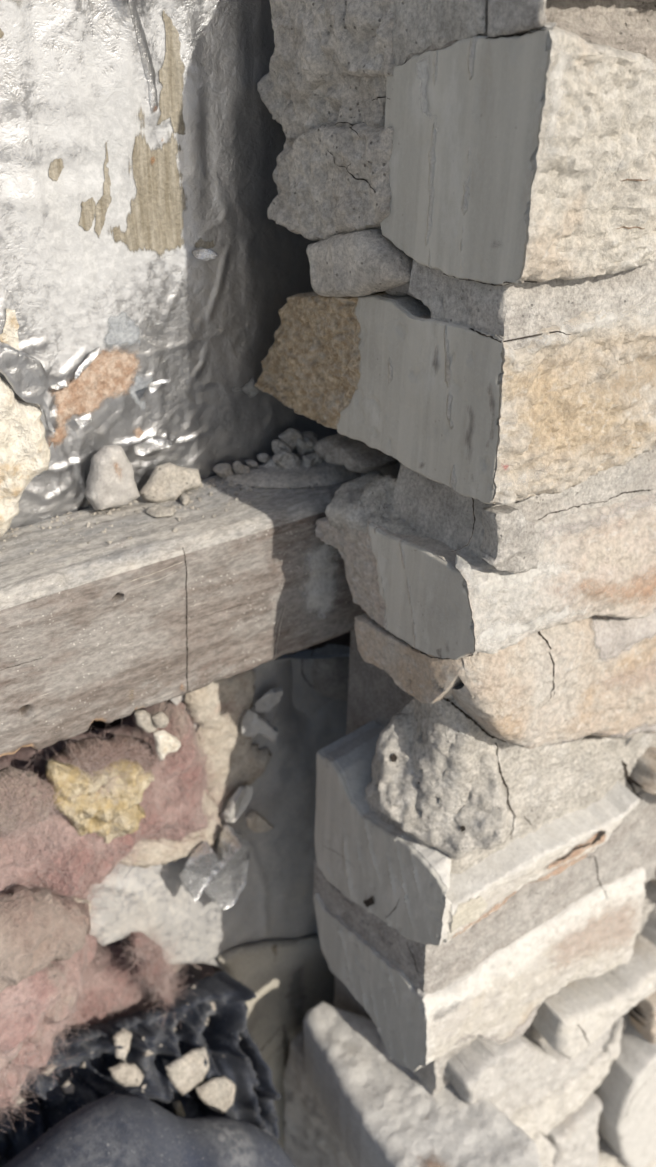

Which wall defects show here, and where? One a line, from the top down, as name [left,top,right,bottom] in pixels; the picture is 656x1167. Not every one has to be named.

peeling [79,10,219,261]
peeling [49,158,63,181]
peeling [0,309,170,538]
crack [538,489,652,520]
crack [538,631,555,695]
crack [443,697,532,838]
crack [622,760,645,801]